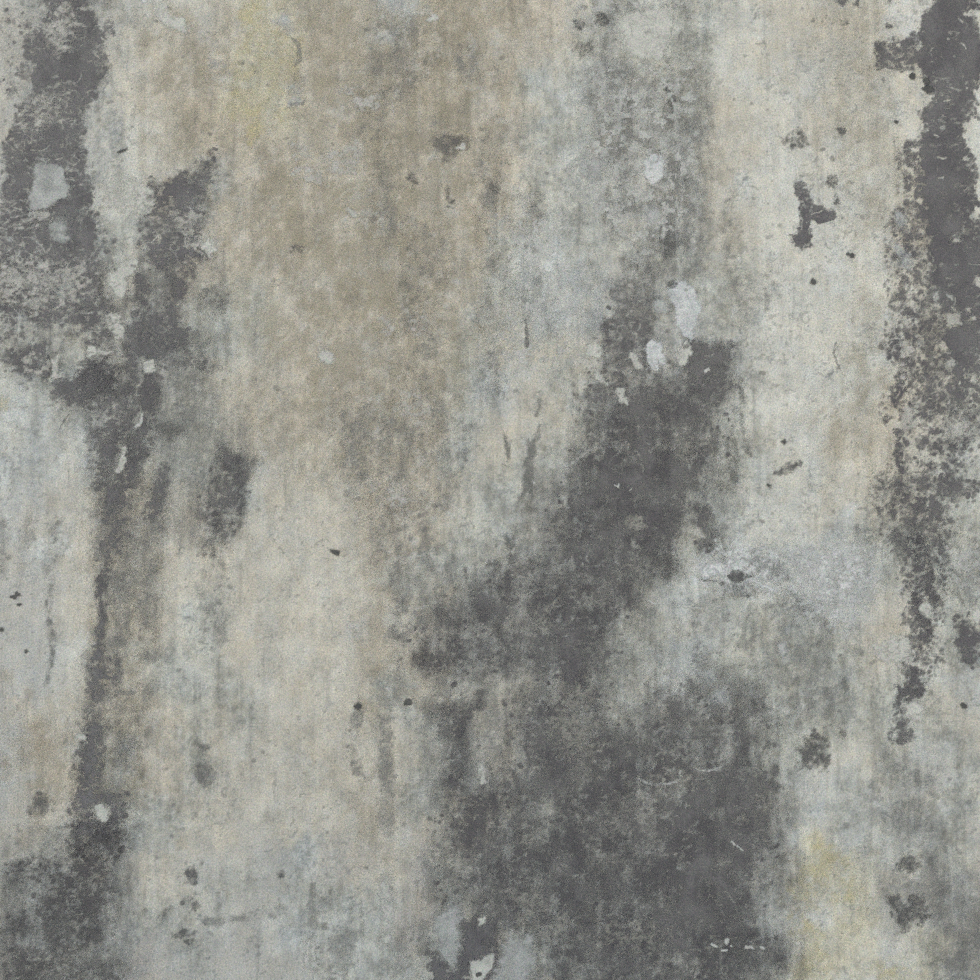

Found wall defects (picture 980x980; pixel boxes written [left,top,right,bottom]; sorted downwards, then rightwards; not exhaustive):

damp [0,0,217,980]
damp [197,450,251,545]
damp [400,278,878,980]
damp [792,181,836,249]
damp [875,0,980,745]